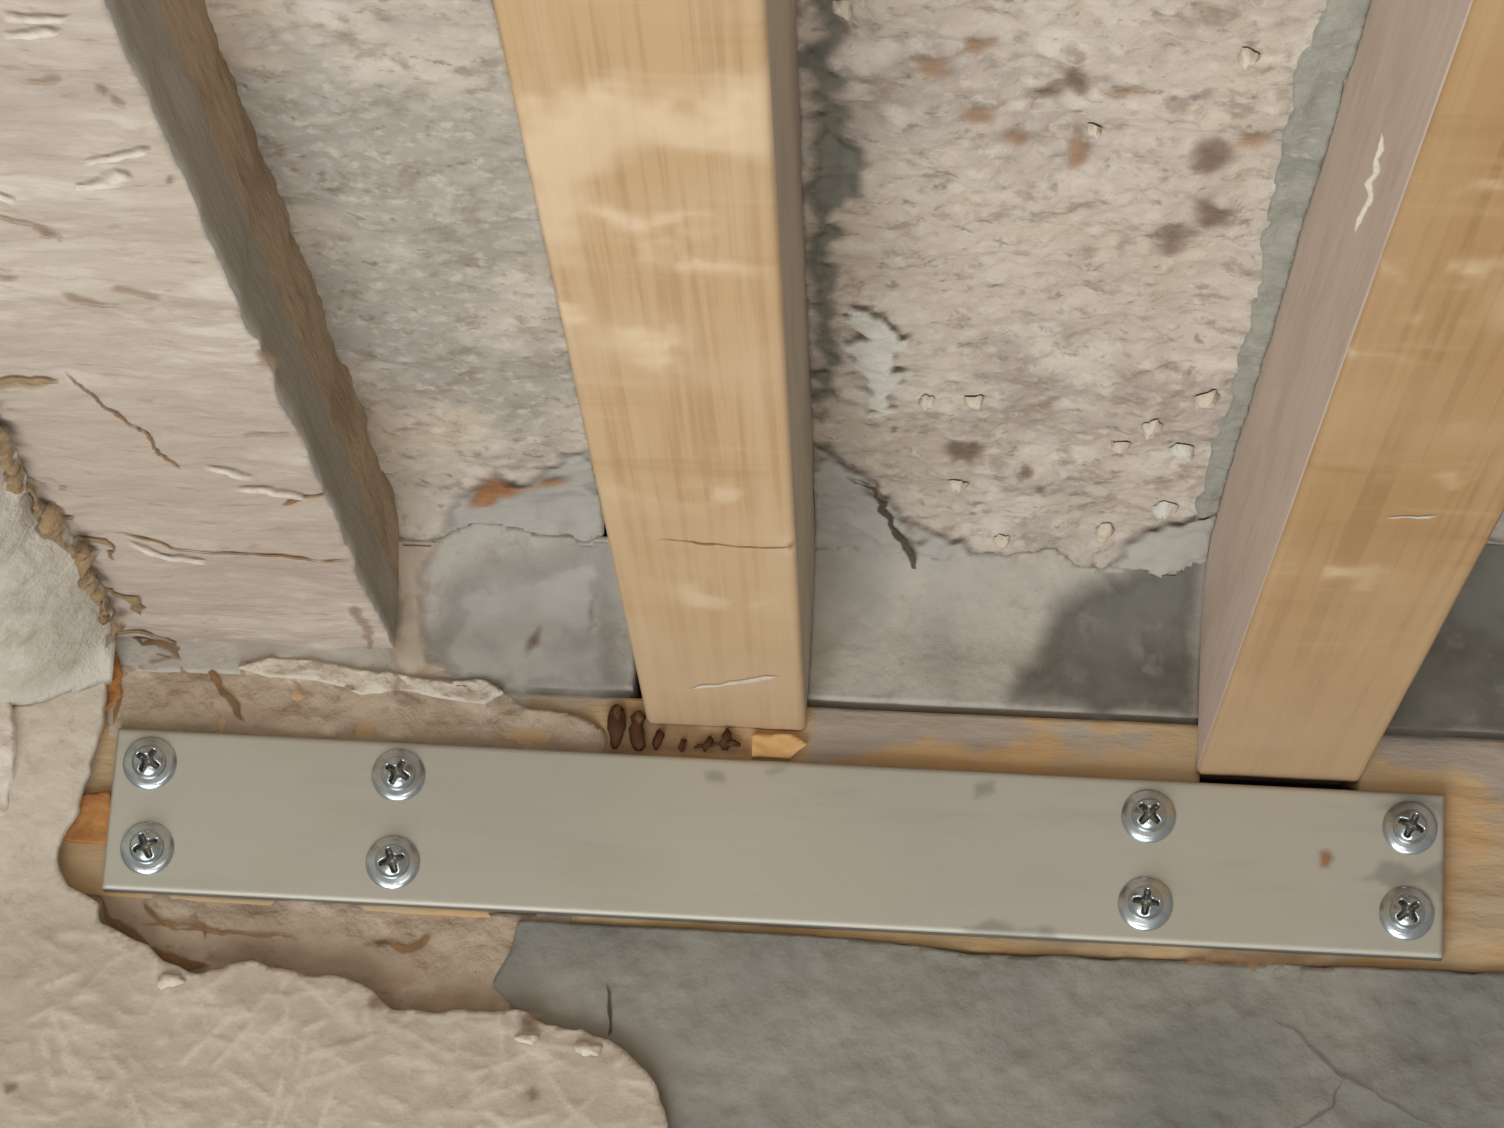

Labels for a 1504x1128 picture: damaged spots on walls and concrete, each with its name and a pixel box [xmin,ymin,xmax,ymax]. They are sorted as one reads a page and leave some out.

water stain [1040,76,1084,98]
water stain [1196,144,1226,173]
water stain [1164,205,1228,253]
water stain [949,444,978,461]
crack [851,480,916,569]
water stain [1014,563,1197,716]
spalling [157,974,186,990]
spalling [514,1014,540,1045]
spalling [574,1041,603,1057]